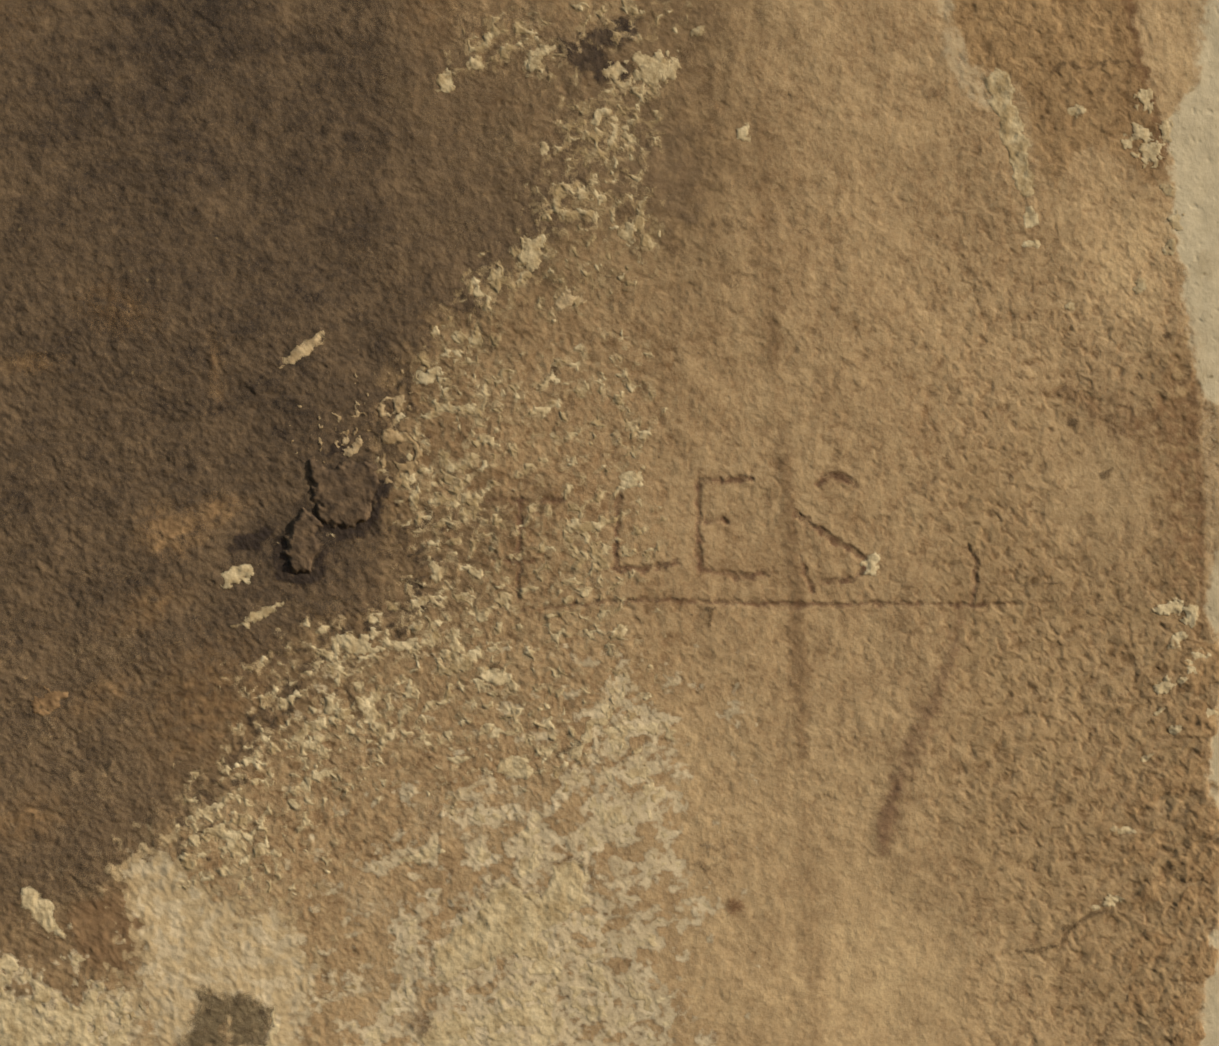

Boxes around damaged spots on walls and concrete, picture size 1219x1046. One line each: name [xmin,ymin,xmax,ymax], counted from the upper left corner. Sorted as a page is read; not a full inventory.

peeling [0,0,726,1046]
peeling [1121,88,1174,169]